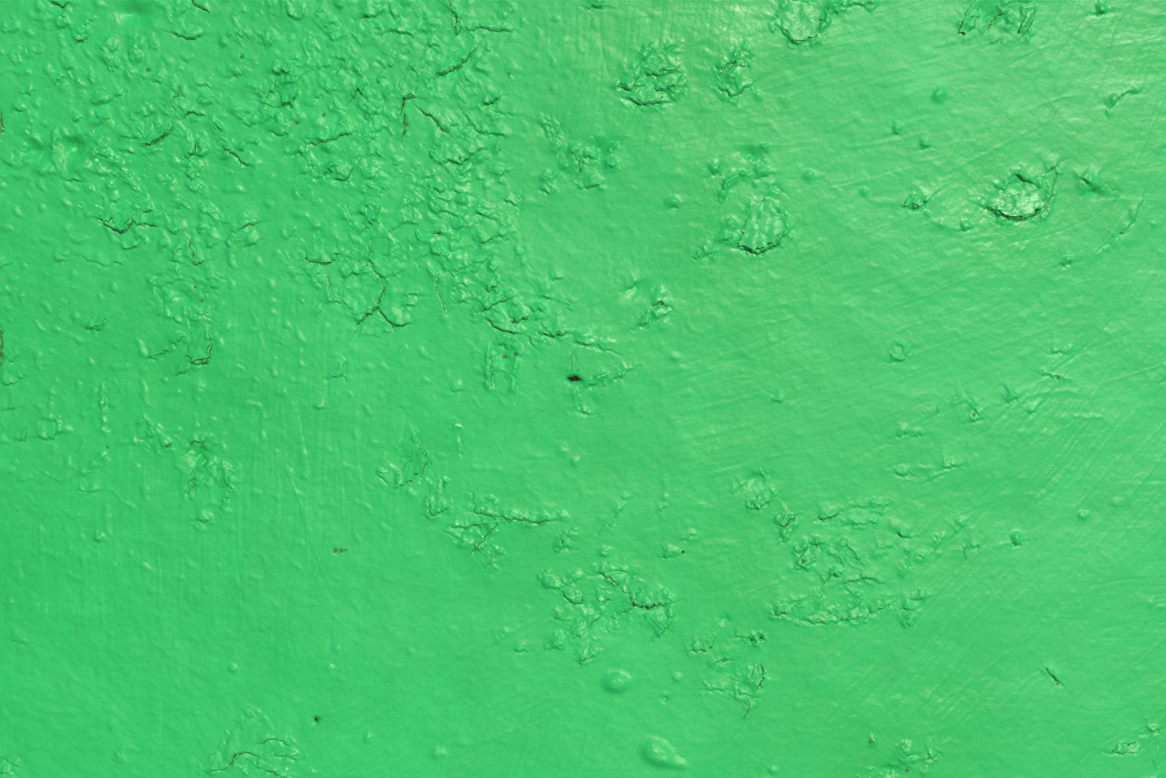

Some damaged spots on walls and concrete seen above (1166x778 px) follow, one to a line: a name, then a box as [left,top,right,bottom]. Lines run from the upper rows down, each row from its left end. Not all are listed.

peeling [767,0,879,55]
peeling [949,0,1043,54]
peeling [609,36,689,115]
peeling [708,39,757,105]
peeling [0,0,624,403]
peeling [692,142,796,266]
peeling [972,152,1069,228]
peeling [616,273,677,336]
peeling [130,412,246,531]
peeling [371,432,682,669]
peeling [683,467,950,730]
peeling [196,701,308,778]